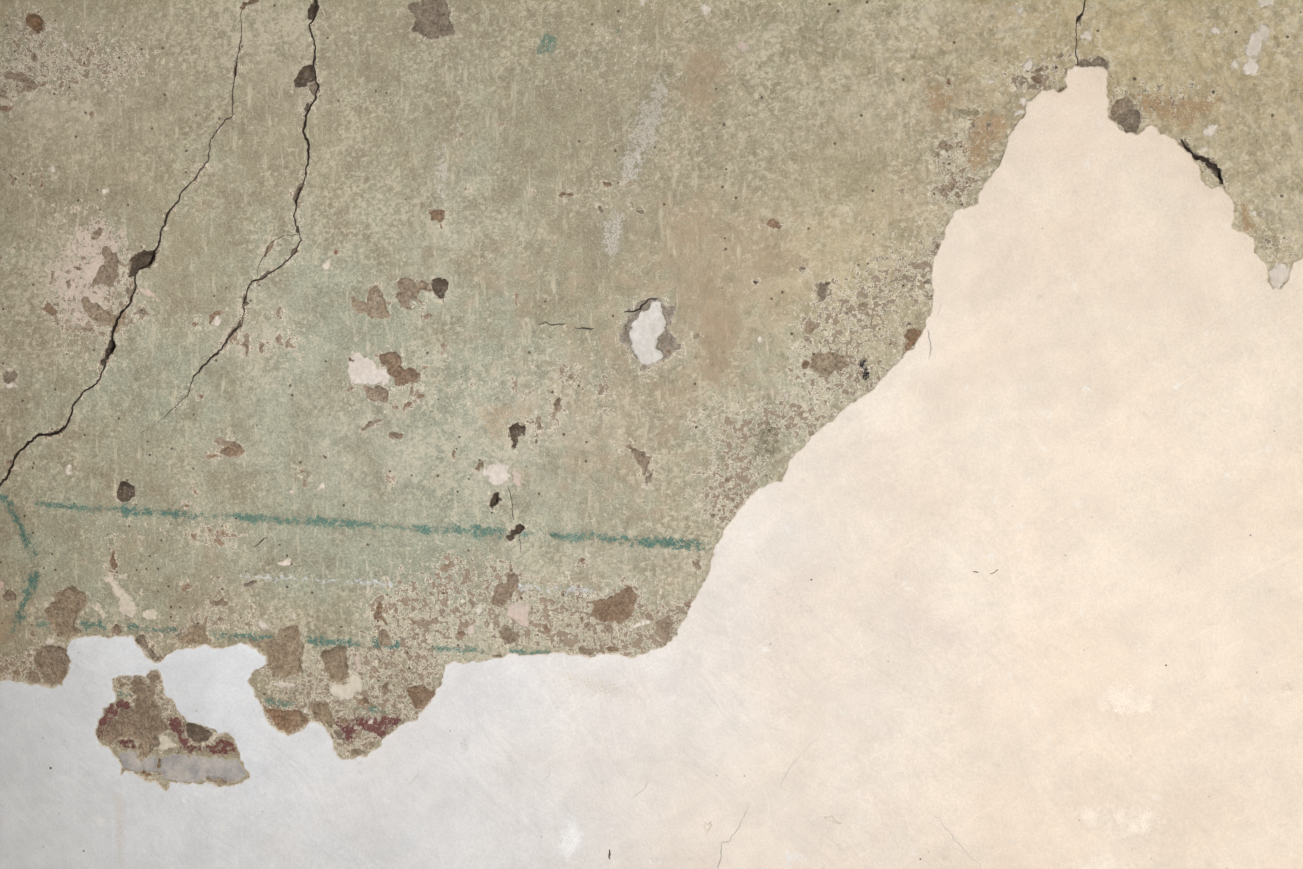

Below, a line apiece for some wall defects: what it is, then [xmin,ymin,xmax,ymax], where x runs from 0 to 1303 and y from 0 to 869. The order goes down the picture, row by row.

peeling [1110,96,1141,134]
peeling [42,216,160,334]
crack [0,11,242,486]
crack [141,0,320,433]
peeling [350,277,449,320]
peeling [618,297,700,371]
peeling [346,351,429,440]
spalling [0,585,88,687]
peeling [243,604,305,679]
peeling [578,584,638,656]
peeling [103,624,214,779]
peeling [265,701,378,757]